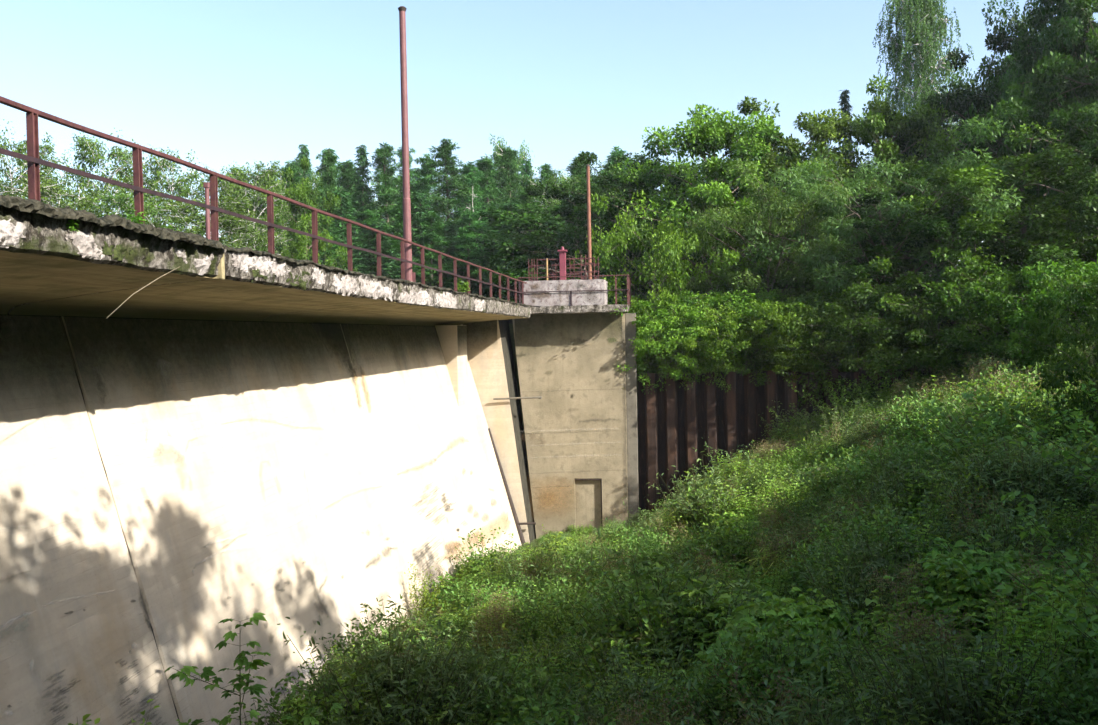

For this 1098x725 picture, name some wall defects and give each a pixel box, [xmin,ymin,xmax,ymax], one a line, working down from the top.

spalling [0,219,29,248]
spalling [65,229,105,260]
spalling [174,247,214,275]
spalling [231,251,291,280]